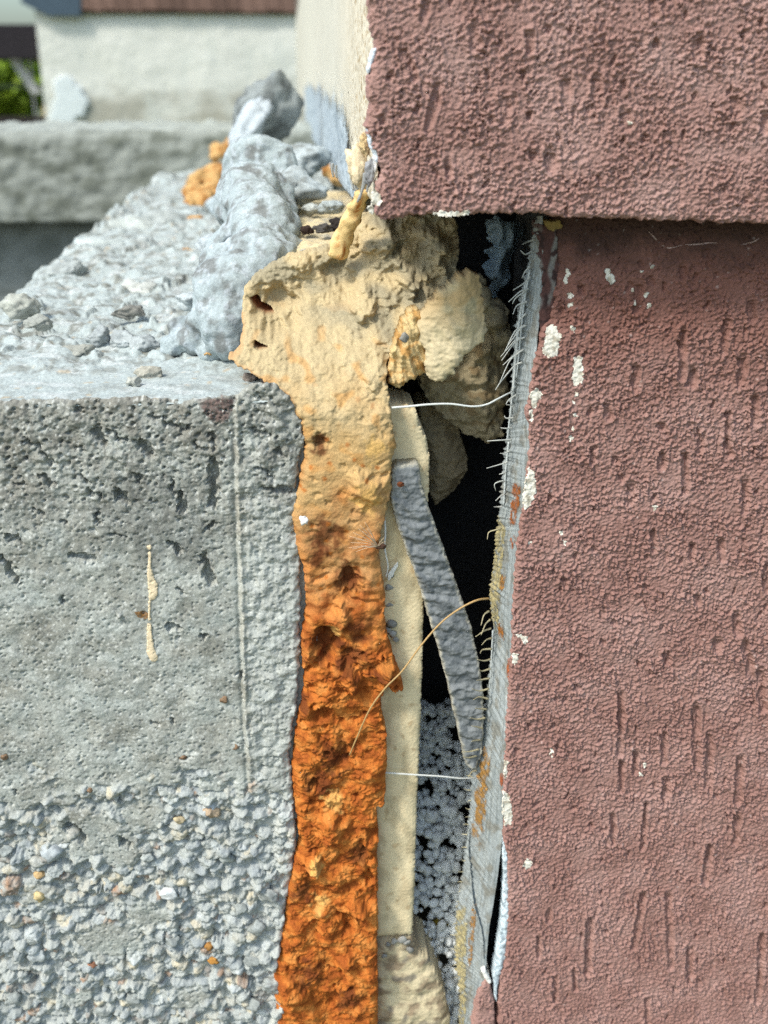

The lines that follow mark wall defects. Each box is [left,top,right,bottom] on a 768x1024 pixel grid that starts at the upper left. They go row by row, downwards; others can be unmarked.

peeling [529,388,543,422]
peeling [522,467,537,510]
peeling [512,634,528,665]
peeling [502,760,513,826]
crack [469,834,509,1001]